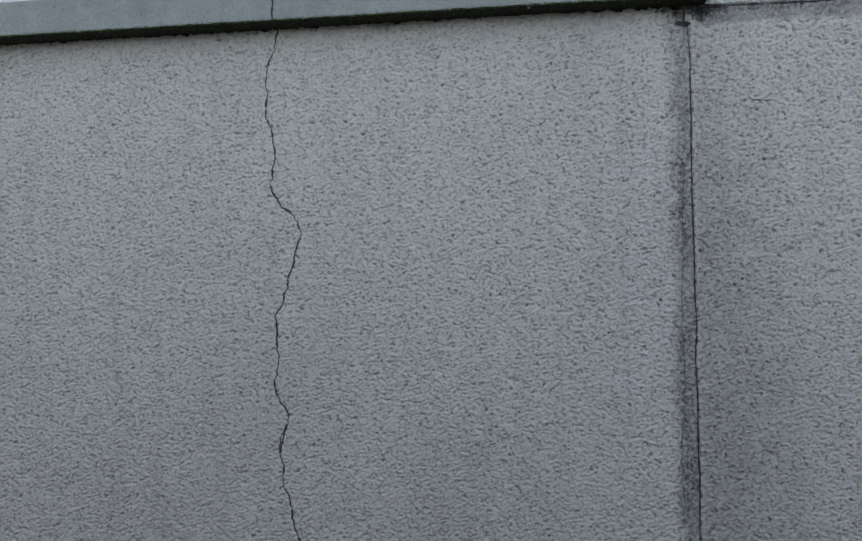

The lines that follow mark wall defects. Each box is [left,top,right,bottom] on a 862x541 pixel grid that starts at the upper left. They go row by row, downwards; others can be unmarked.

crack [265,0,302,541]